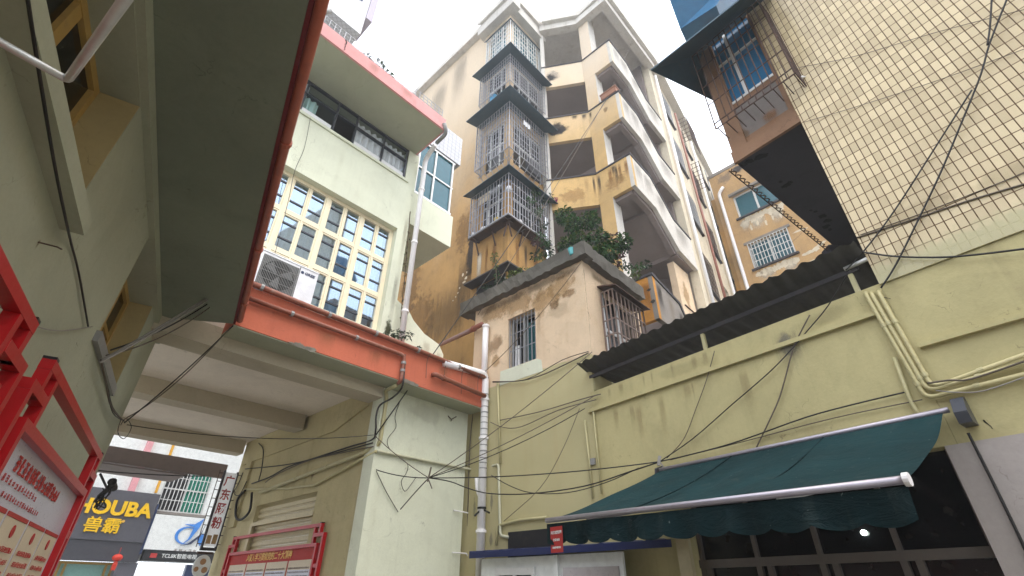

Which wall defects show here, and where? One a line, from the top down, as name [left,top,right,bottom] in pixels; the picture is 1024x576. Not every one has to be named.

flaking render [740,202,784,230]
flaking render [756,240,826,277]